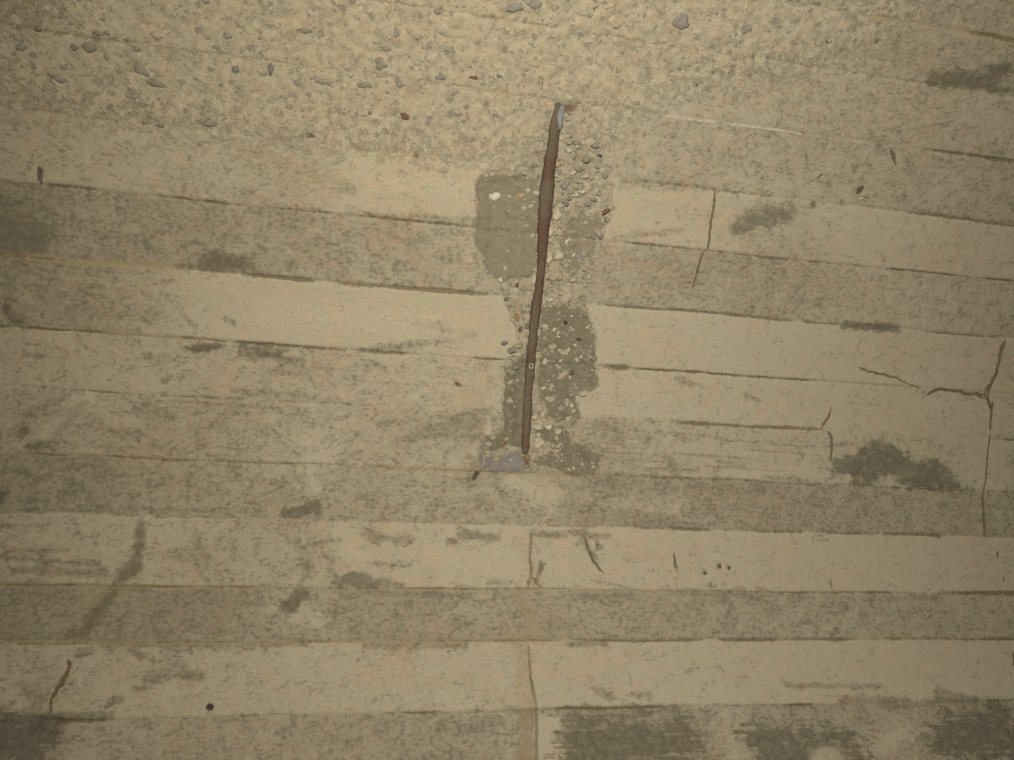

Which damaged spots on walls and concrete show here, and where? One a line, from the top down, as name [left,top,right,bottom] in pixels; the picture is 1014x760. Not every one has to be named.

crack [687,191,716,289]
spalling [473,100,616,477]
crack [821,407,833,457]
damp [829,440,968,492]
crack [859,340,1006,582]
damp [546,712,705,760]
damp [734,720,878,760]
damp [922,704,1014,760]